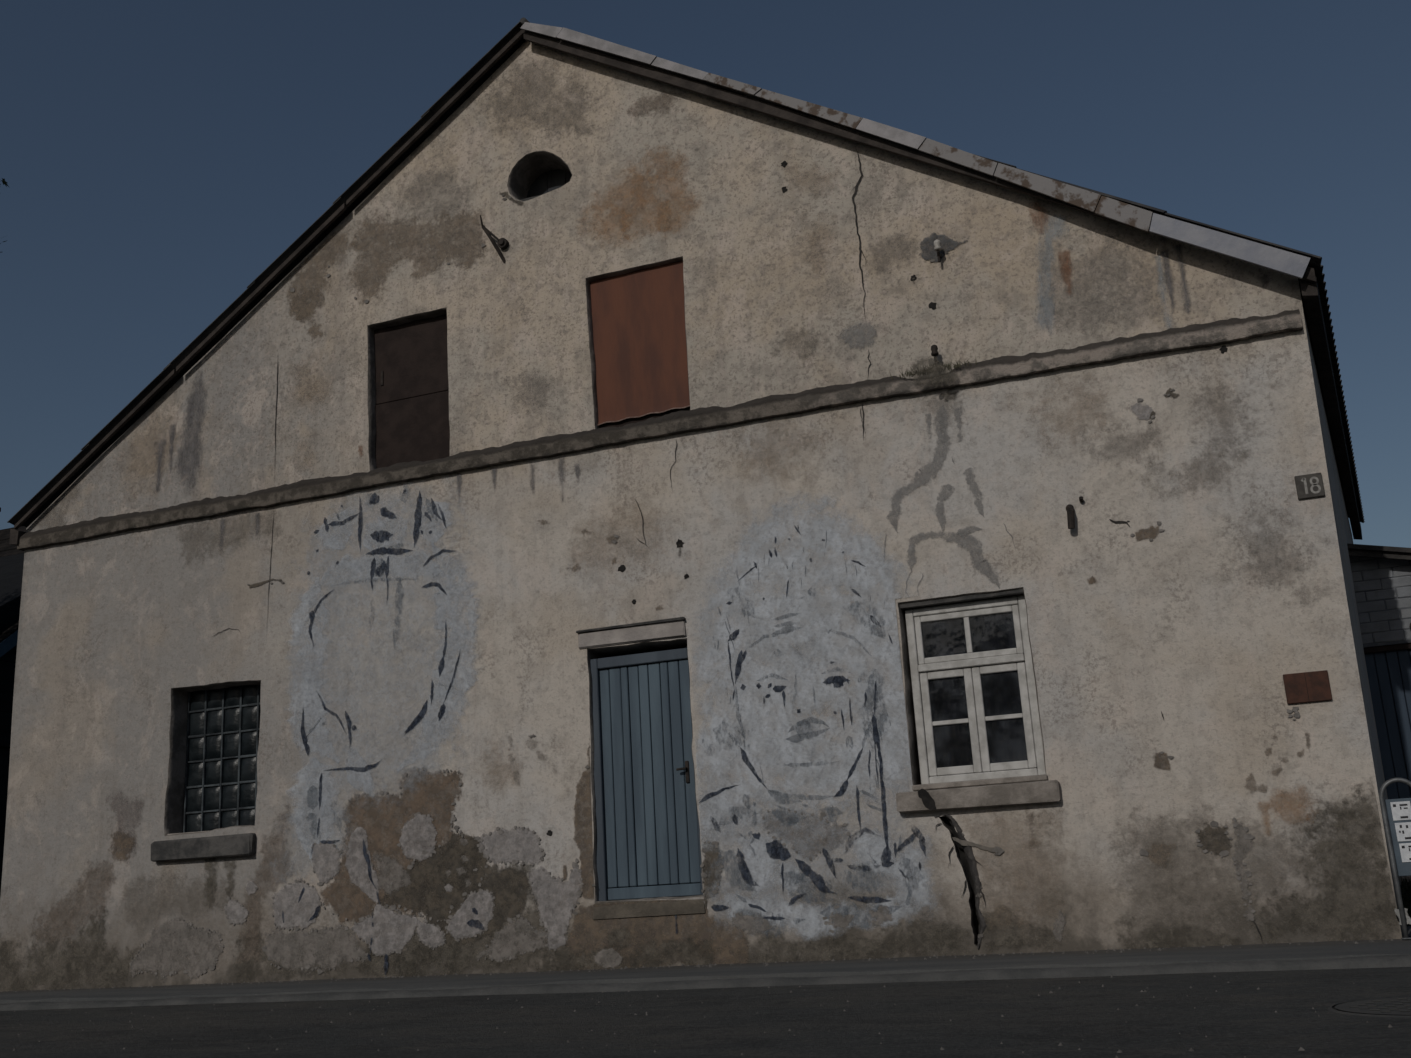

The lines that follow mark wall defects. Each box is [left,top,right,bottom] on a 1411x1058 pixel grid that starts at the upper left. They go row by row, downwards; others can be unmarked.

crack [852,144,871,371]
leakage [0,792,143,991]
peeling [261,738,773,974]
crack [918,789,1004,949]
leakage [1263,790,1399,943]